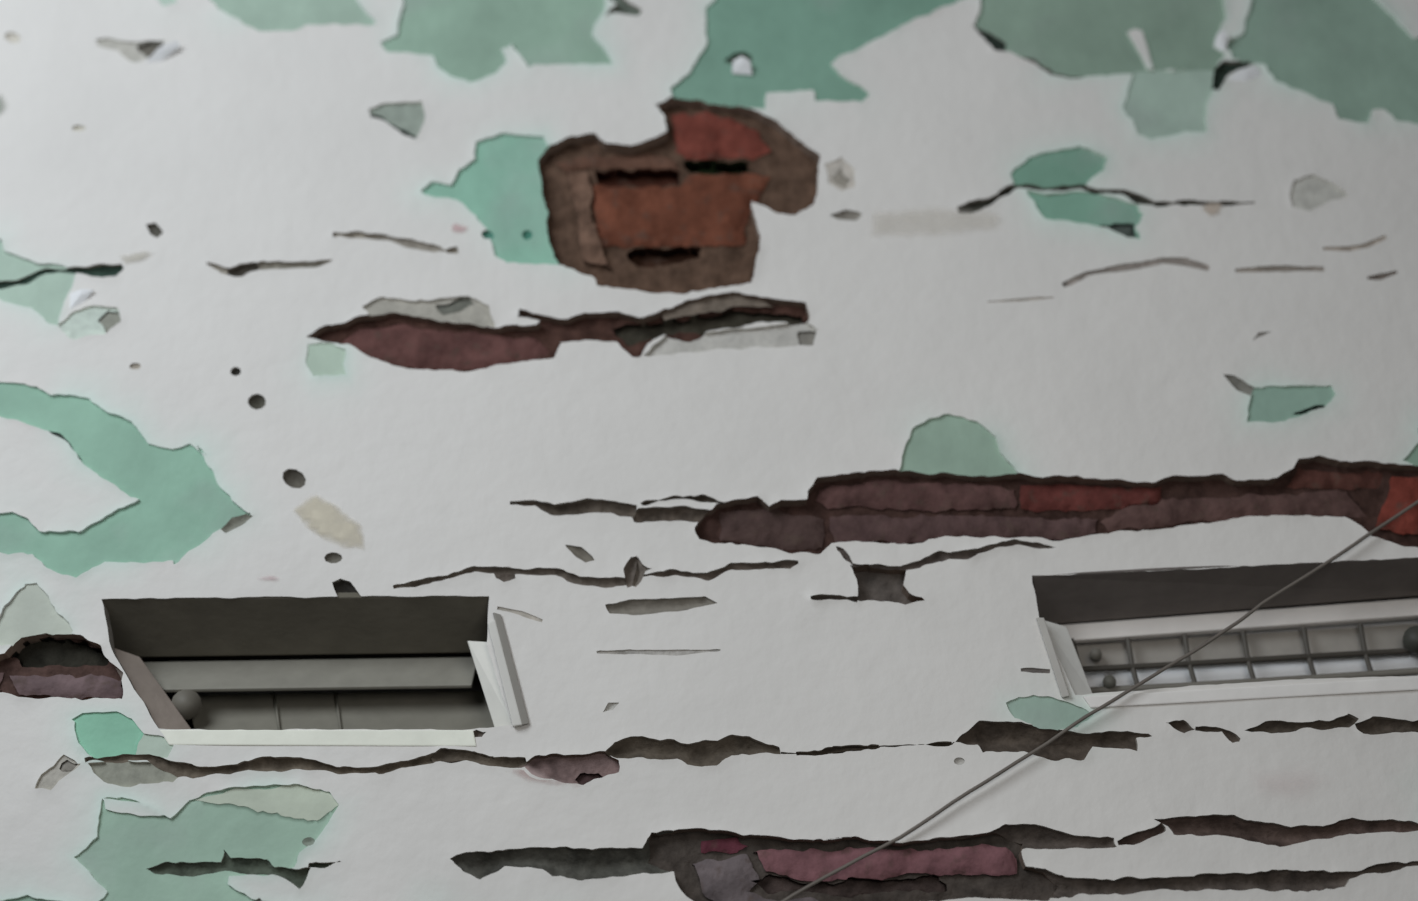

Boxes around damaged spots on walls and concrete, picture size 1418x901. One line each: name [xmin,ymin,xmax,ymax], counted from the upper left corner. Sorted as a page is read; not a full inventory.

peeling [975,0,1418,139]
spalling [306,0,958,376]
peeling [1010,146,1143,239]
crack [957,184,1255,214]
peeling [0,239,121,339]
peeling [0,382,252,578]
spalling [695,414,1418,554]
crack [393,494,1055,622]
peeling [0,583,339,901]
crack [84,748,527,778]
crack [605,714,1418,767]
spalling [648,828,1057,901]